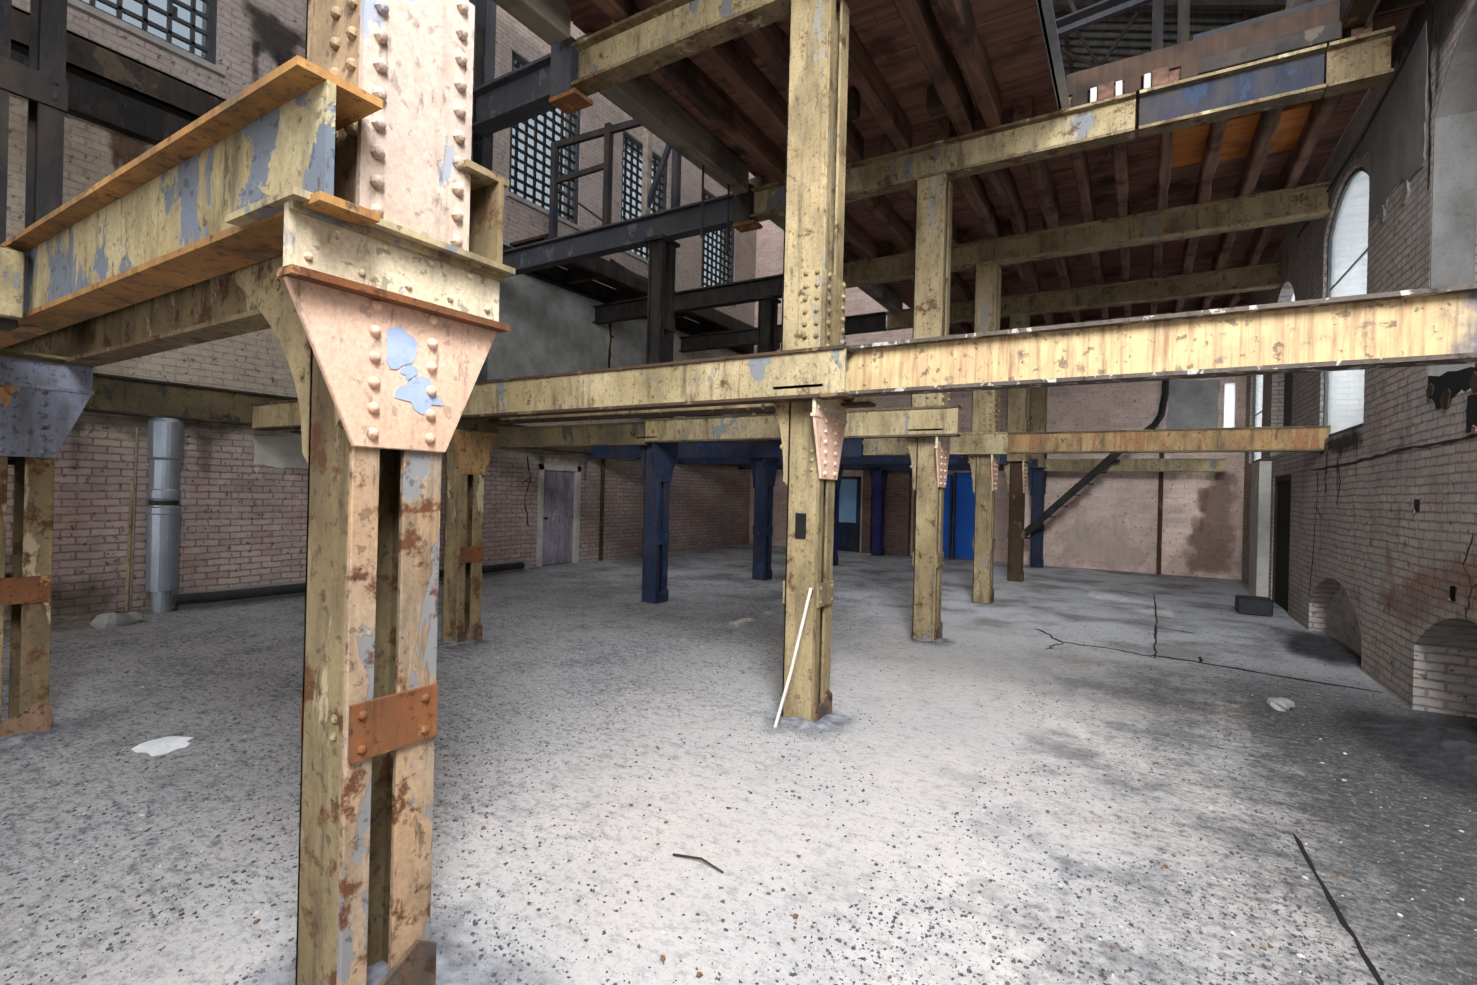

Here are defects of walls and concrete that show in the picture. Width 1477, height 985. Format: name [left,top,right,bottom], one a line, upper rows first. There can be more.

peeling [386,327,444,414]
spalling [1426,367,1477,434]
crack [1309,433,1477,596]
crack [1293,833,1384,985]